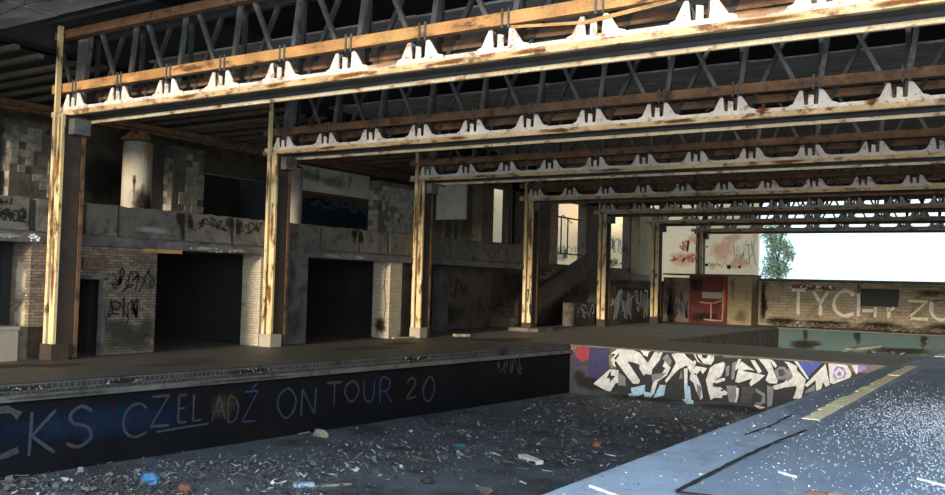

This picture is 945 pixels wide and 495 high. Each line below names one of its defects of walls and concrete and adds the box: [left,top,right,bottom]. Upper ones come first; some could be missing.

corrosion [727,7,792,25]
corrosion [339,61,397,78]
corrosion [49,117,61,208]